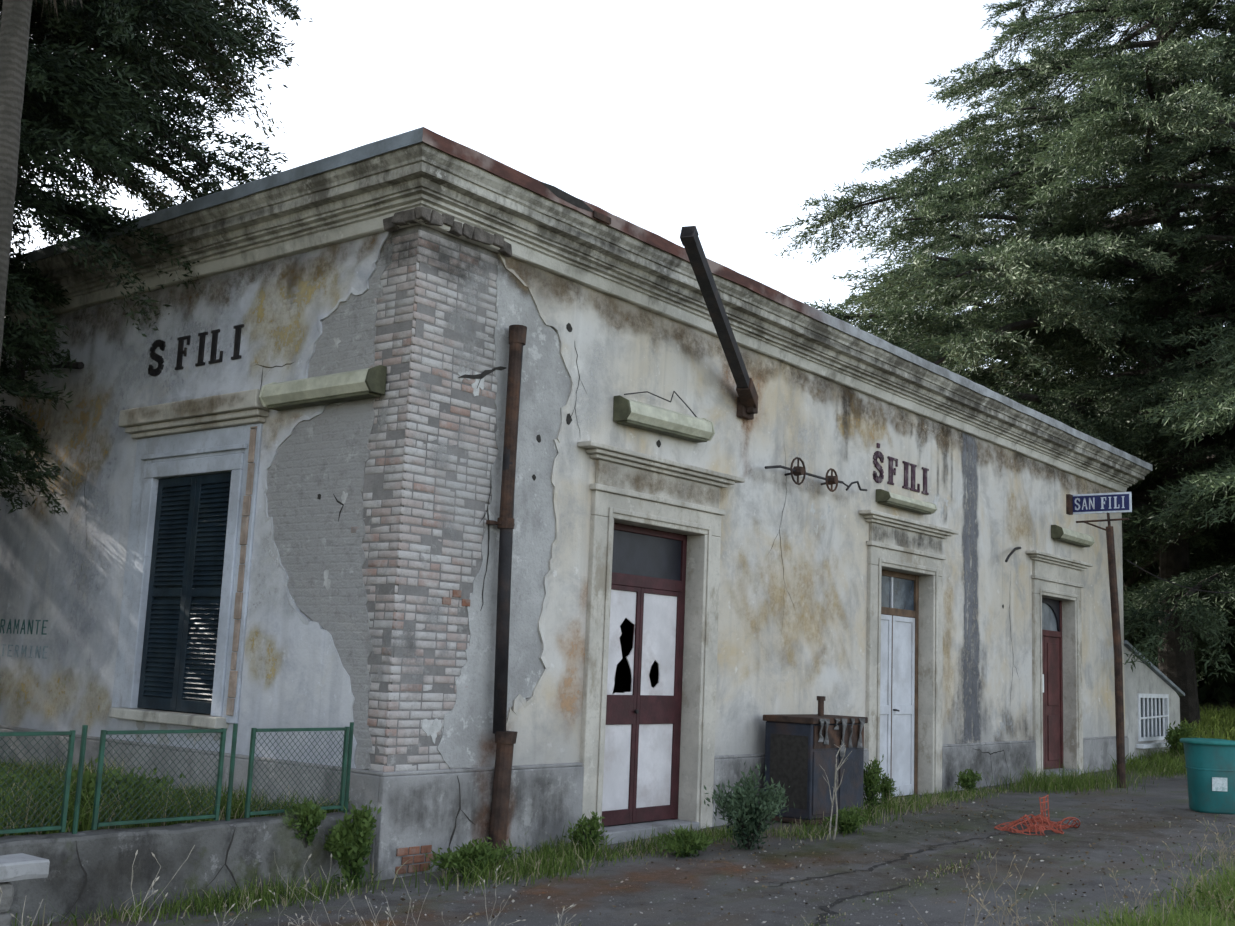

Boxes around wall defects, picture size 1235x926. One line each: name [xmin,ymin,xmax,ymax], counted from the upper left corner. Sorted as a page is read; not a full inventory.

leakage [252,244,339,352]
leakage [596,297,720,355]
spalling [226,207,575,772]
leakage [840,387,1105,743]
crack [449,776,475,849]